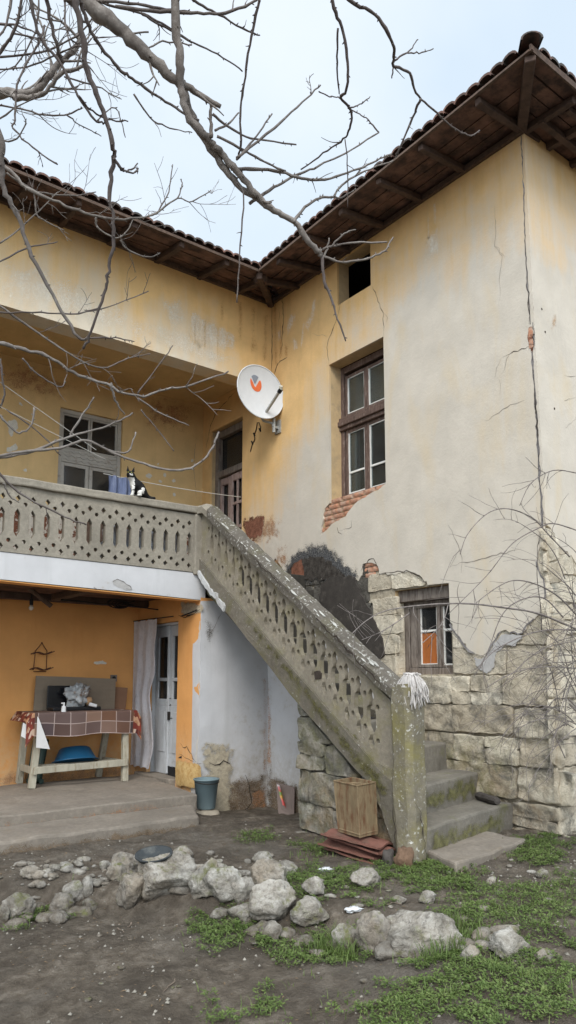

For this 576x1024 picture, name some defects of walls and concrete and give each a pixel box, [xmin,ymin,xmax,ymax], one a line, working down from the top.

crack [493,136,544,524]
peeling [0,502,83,555]
peeling [179,536,226,642]
mould [285,542,360,584]
flaking render [322,484,385,532]
flaking render [420,528,576,837]
flaking render [175,737,237,811]